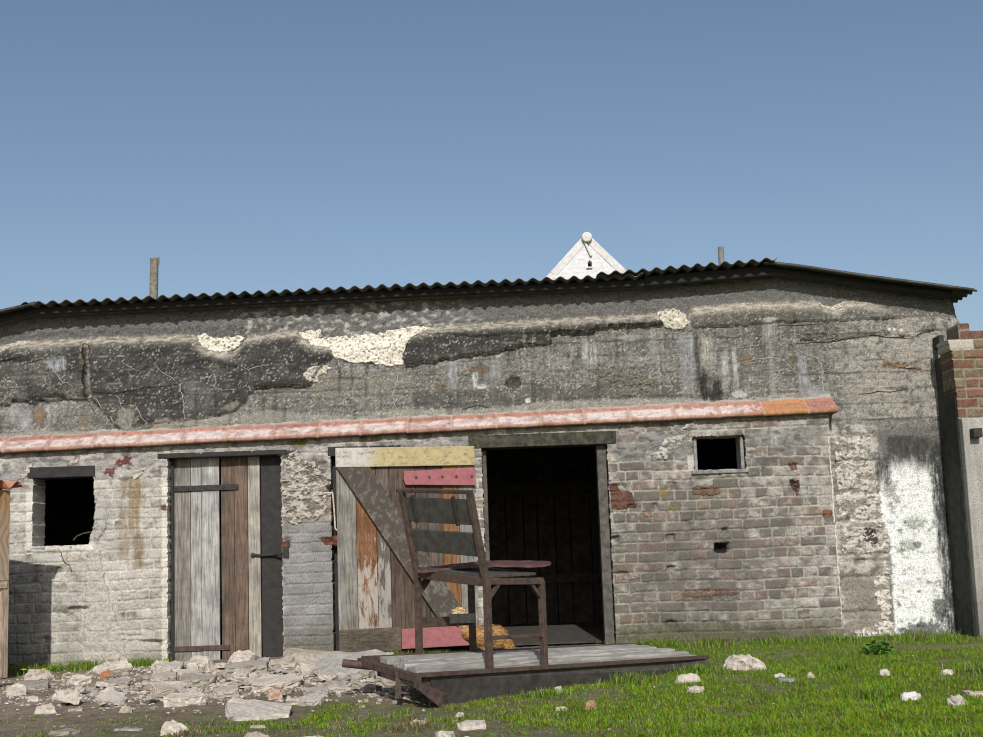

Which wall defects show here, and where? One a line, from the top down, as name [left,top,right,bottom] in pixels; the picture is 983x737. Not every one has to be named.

spalling [657,308,691,331]
spalling [197,333,244,352]
spalling [299,326,430,382]
spalling [609,483,653,517]
damp [876,436,956,636]